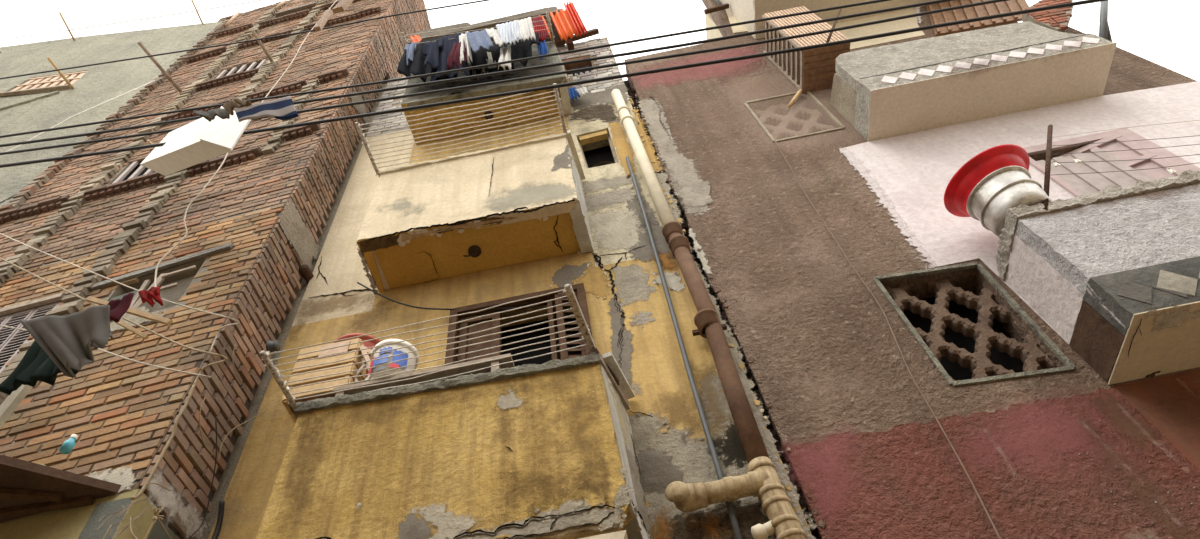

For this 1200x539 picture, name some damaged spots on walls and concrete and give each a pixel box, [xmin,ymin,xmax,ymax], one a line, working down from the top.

crack [278,223,369,298]
spalling [357,213,518,295]
crack [369,158,575,282]
crack [593,245,646,365]
peeling [537,84,817,539]
peeling [1144,305,1200,332]
crack [446,411,653,539]
spalling [409,370,777,539]